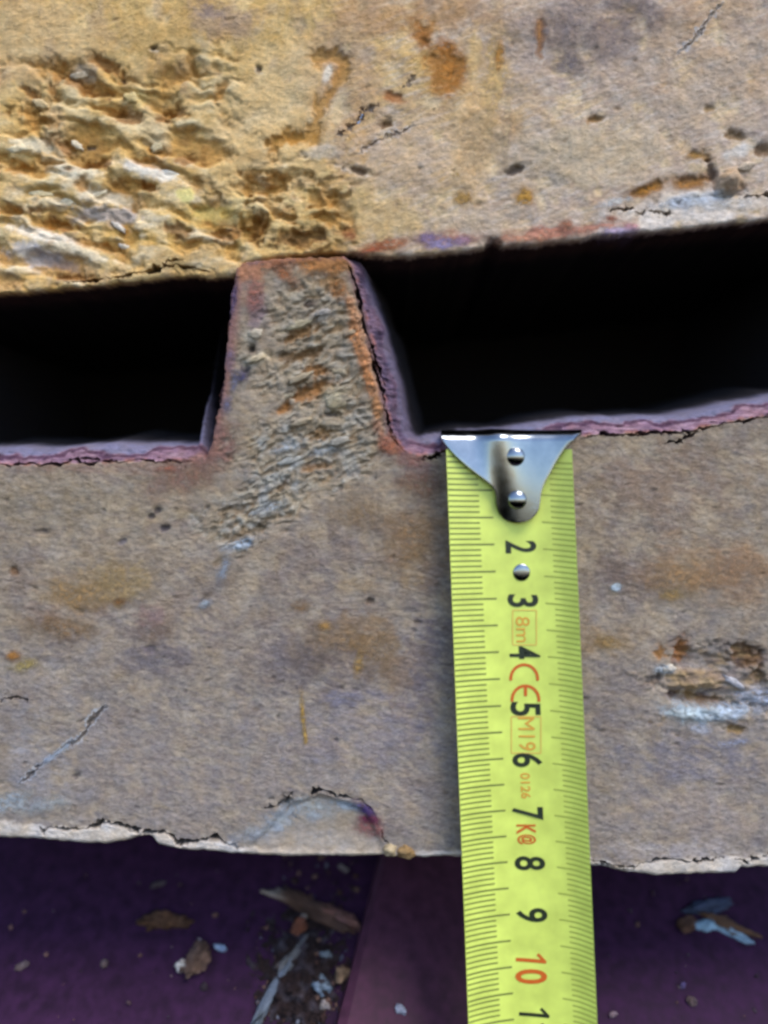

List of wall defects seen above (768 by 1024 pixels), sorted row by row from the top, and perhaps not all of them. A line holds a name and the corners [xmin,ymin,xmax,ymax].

crack [670,0,729,59]
rust [433,38,465,88]
crack [326,69,424,159]
spalling [0,37,393,568]
crack [0,691,35,707]
spalling [633,633,768,735]
crack [13,701,113,791]
crack [28,813,249,852]
crack [256,783,392,847]